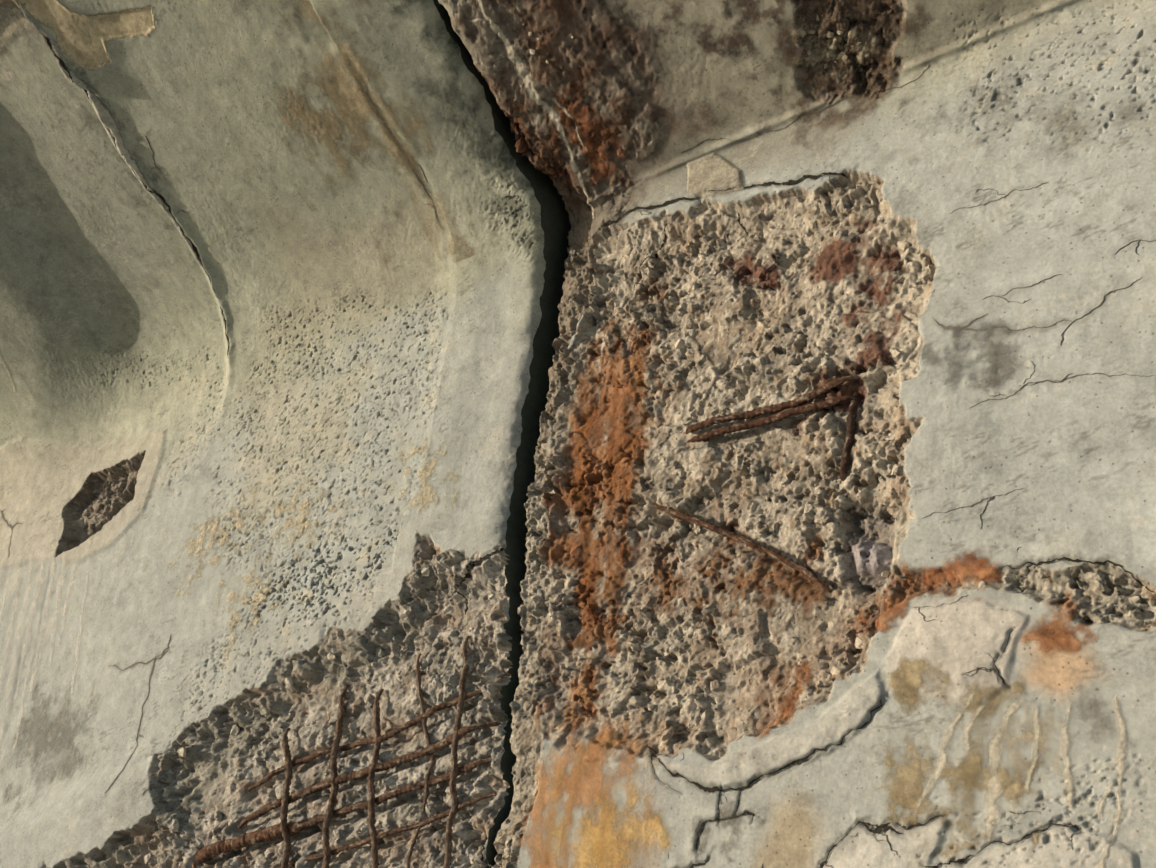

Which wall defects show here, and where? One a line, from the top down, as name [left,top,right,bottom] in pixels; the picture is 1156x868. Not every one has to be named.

peeling [19,0,208,276]
spalling [500,108,551,170]
damp [470,0,594,221]
damp [695,0,928,125]
crack [600,170,851,290]
corrosion [804,221,903,411]
corrosion [523,325,669,868]
spalling [54,153,1156,868]
corrosion [858,553,1001,632]
crack [648,699,882,868]
crack [820,811,1081,868]
damp [884,682,1047,855]